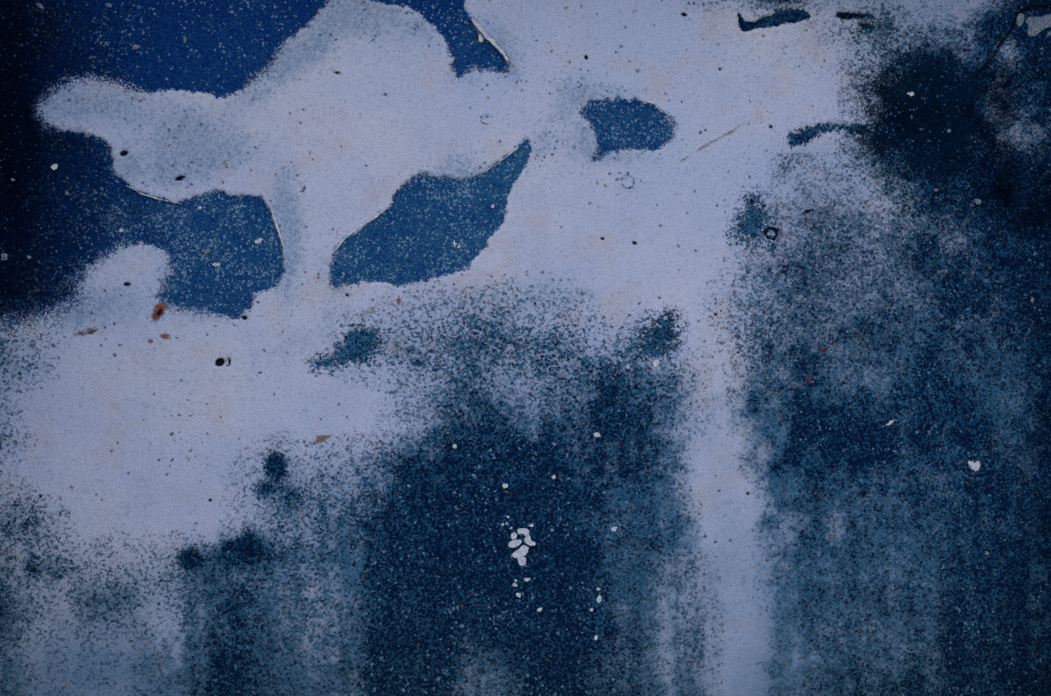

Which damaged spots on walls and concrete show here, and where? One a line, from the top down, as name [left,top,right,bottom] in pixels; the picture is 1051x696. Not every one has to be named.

peeling [371,0,511,79]
peeling [737,8,811,32]
peeling [0,0,329,331]
peeling [580,96,678,161]
peeling [787,122,871,148]
peeling [329,139,532,297]
peeling [502,516,536,598]